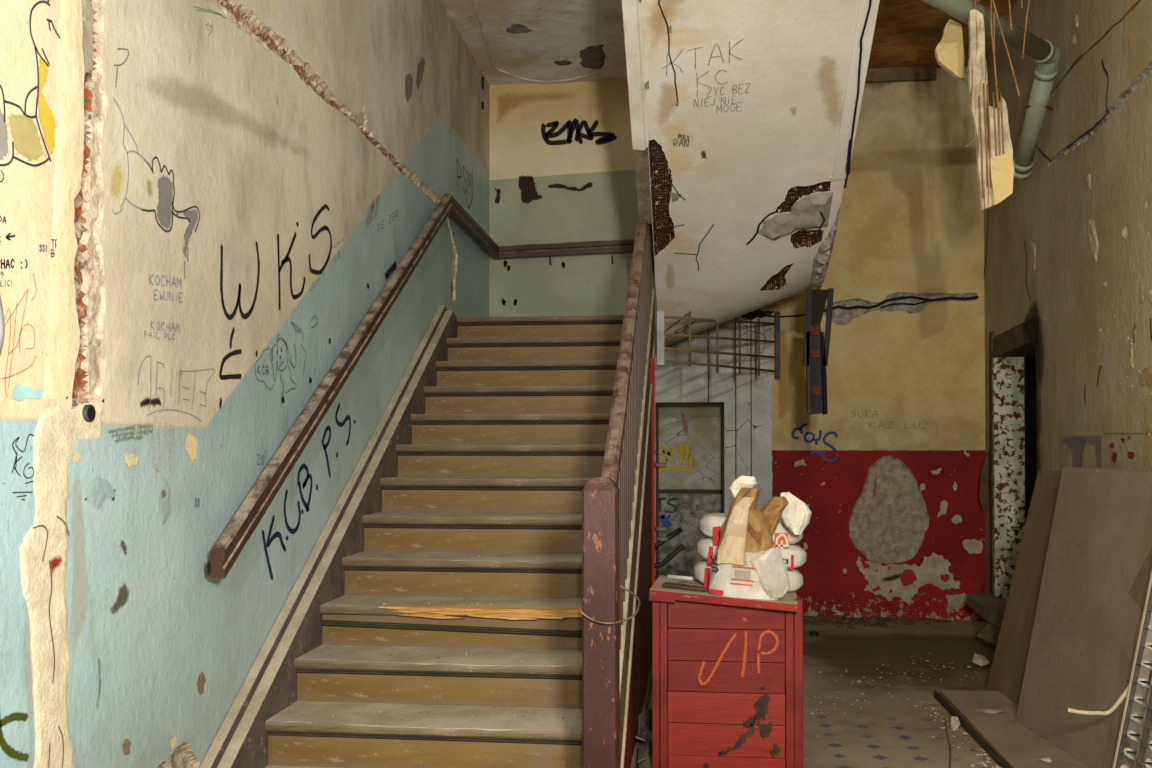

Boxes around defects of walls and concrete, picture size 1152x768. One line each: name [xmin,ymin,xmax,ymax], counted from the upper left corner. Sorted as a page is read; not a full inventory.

crack [658,0,678,101]
crack [1037,0,1141,162]
spalling [649,140,675,256]
spalling [776,162,847,213]
spalling [760,263,794,291]
spalling [791,208,840,290]
crack [767,215,988,325]
peeling [1109,436,1135,463]
spalling [842,456,966,609]
peeling [962,539,983,554]
peeling [122,738,131,755]
spalling [157,735,200,768]